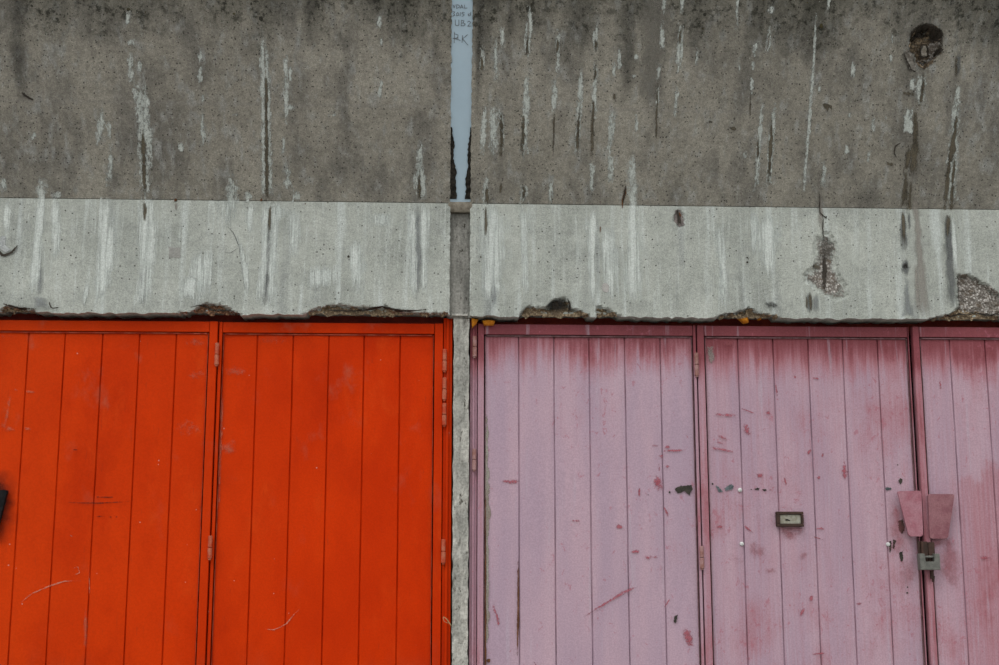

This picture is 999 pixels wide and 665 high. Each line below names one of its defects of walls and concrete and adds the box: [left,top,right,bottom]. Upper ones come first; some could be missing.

leakage [30,180,62,291]
leakage [127,40,156,301]
leakage [224,40,300,302]
spalling [308,306,448,318]
leakage [408,141,430,291]
leakage [481,177,528,302]
spalling [521,299,617,319]
leakage [586,157,641,298]
spalling [805,237,844,297]
leakage [894,76,927,314]
leakage [943,56,961,299]
spalling [931,274,999,321]